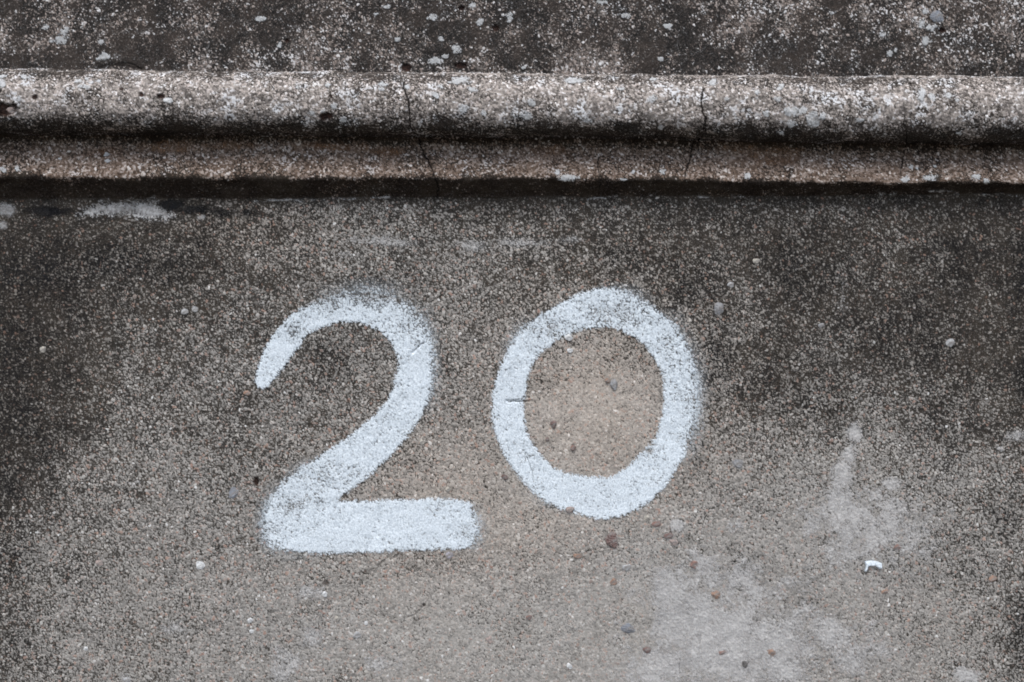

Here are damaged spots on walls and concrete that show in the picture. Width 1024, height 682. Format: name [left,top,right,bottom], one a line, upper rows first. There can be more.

crack [402,78,439,198]
crack [665,88,707,179]